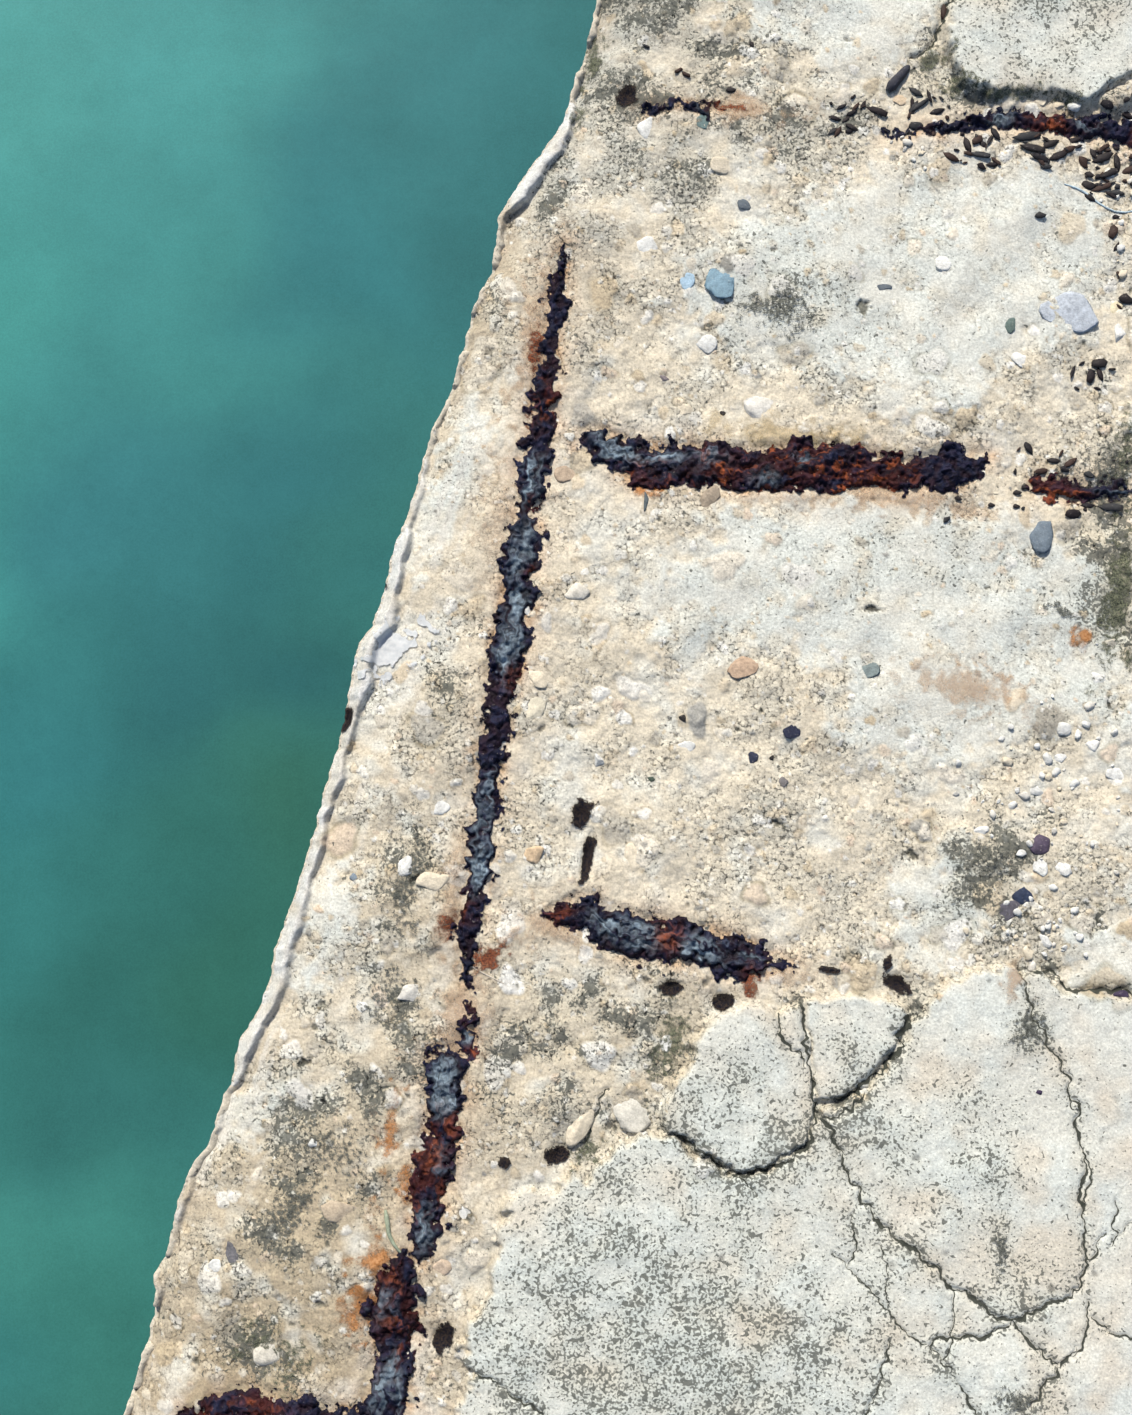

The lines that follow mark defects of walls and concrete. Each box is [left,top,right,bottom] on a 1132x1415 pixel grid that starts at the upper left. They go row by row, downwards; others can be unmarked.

crack [912,0,954,59]
corrosion [880,106,1132,148]
corrosion [577,421,990,508]
corrosion [176,243,573,1415]
corrosion [531,891,800,998]
spalling [711,993,735,1011]
spalling [882,971,912,995]
crack [587,1088,610,1143]
spalling [498,1157,511,1169]
spalling [544,1145,570,1166]
crack [673,969,1132,1415]
crack [477,1373,544,1415]